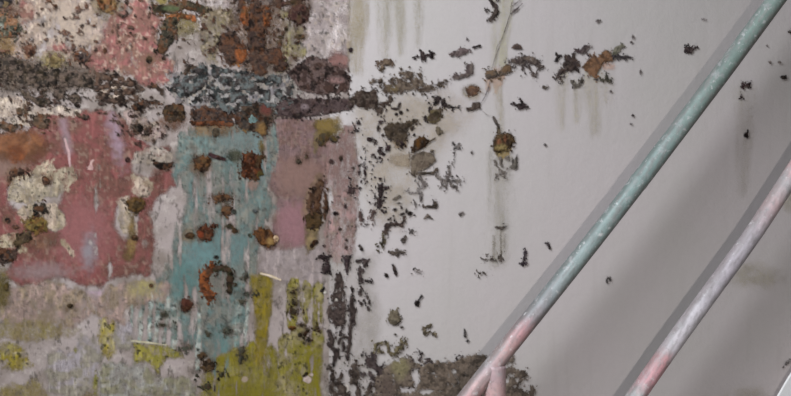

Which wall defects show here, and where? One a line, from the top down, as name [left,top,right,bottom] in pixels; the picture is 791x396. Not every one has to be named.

corrosion [141,0,209,69]
corrosion [213,0,315,84]
corrosion [462,67,505,131]
crack [480,0,523,128]
corrosion [580,42,634,83]
corrosion [127,101,277,191]
peeling [0,0,614,396]
corrosion [147,255,260,330]
corrosion [205,323,237,340]
corrosion [234,344,248,365]